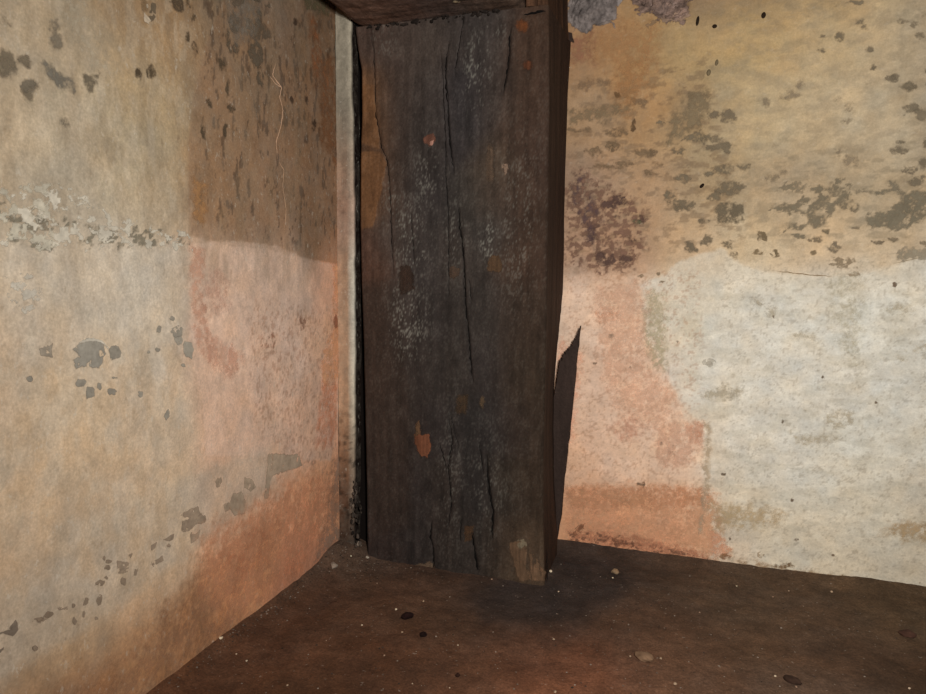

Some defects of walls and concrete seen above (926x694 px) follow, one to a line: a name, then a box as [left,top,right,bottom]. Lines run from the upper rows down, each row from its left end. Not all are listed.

spalling [632,0,693,28]
damp [0,49,30,76]
damp [20,80,37,100]
damp [656,92,736,154]
crack [371,38,414,272]
peeling [0,183,193,252]
crack [440,20,473,378]
damp [564,119,657,275]
damp [685,235,712,252]
damp [698,164,750,223]
damp [765,159,926,283]
peeling [40,343,53,357]